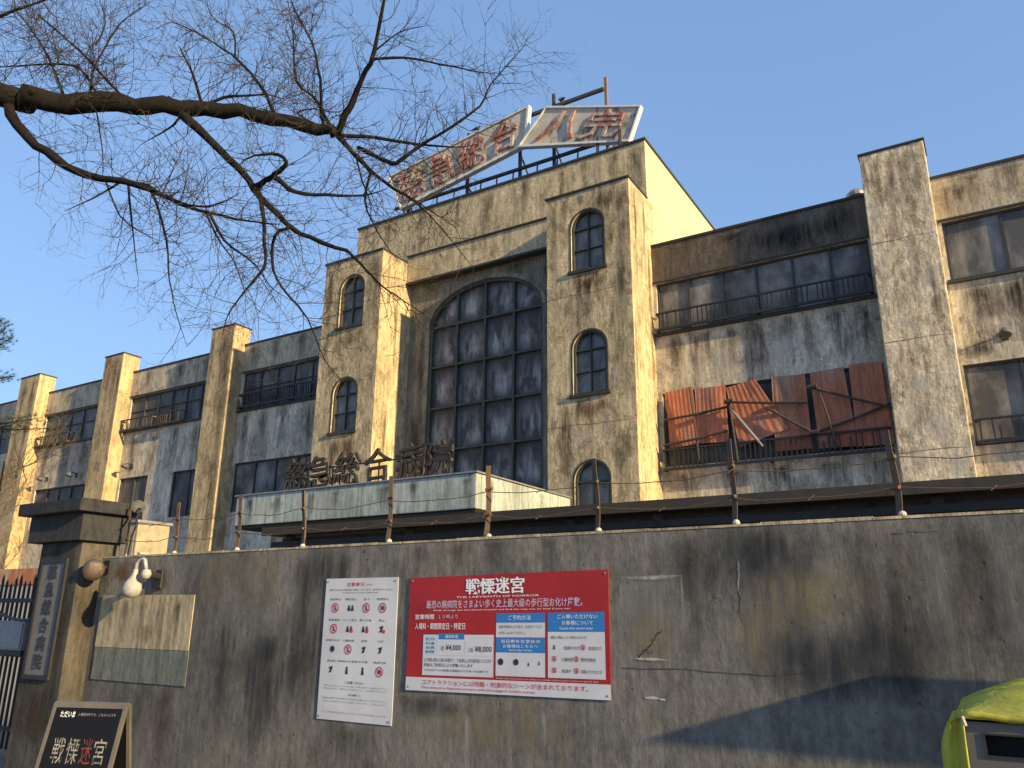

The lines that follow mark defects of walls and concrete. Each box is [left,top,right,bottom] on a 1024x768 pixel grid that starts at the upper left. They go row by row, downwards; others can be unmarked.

crack [622,632,828,676]